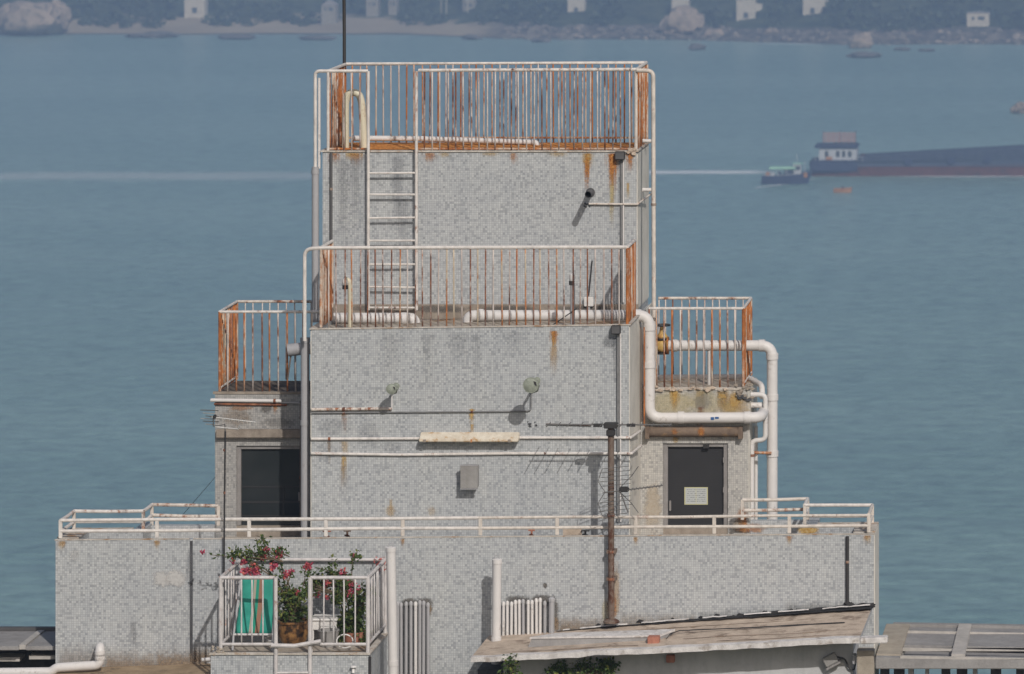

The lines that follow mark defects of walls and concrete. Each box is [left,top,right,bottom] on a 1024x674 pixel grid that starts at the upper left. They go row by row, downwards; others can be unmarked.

rust [333,143,634,199]